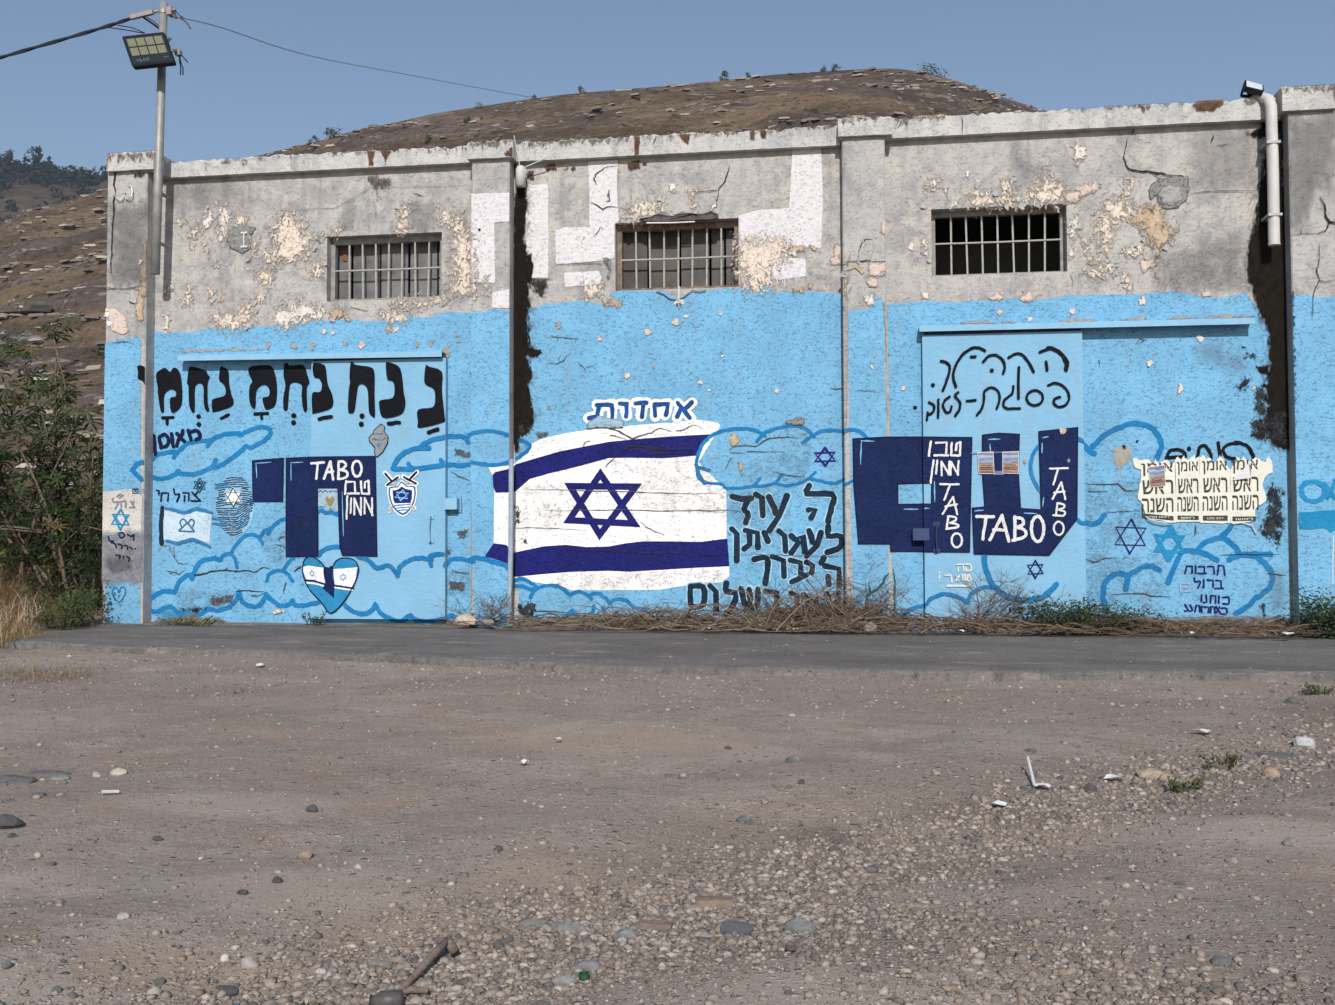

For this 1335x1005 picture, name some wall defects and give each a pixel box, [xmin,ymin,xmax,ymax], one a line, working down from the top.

peeling [104,199,365,353]
peeling [367,173,492,335]
peeling [415,334,460,358]
peeling [725,229,887,429]
peeling [916,161,1190,325]
peeling [1070,140,1088,167]
crack [1123,129,1258,215]
flaking render [1168,314,1254,342]